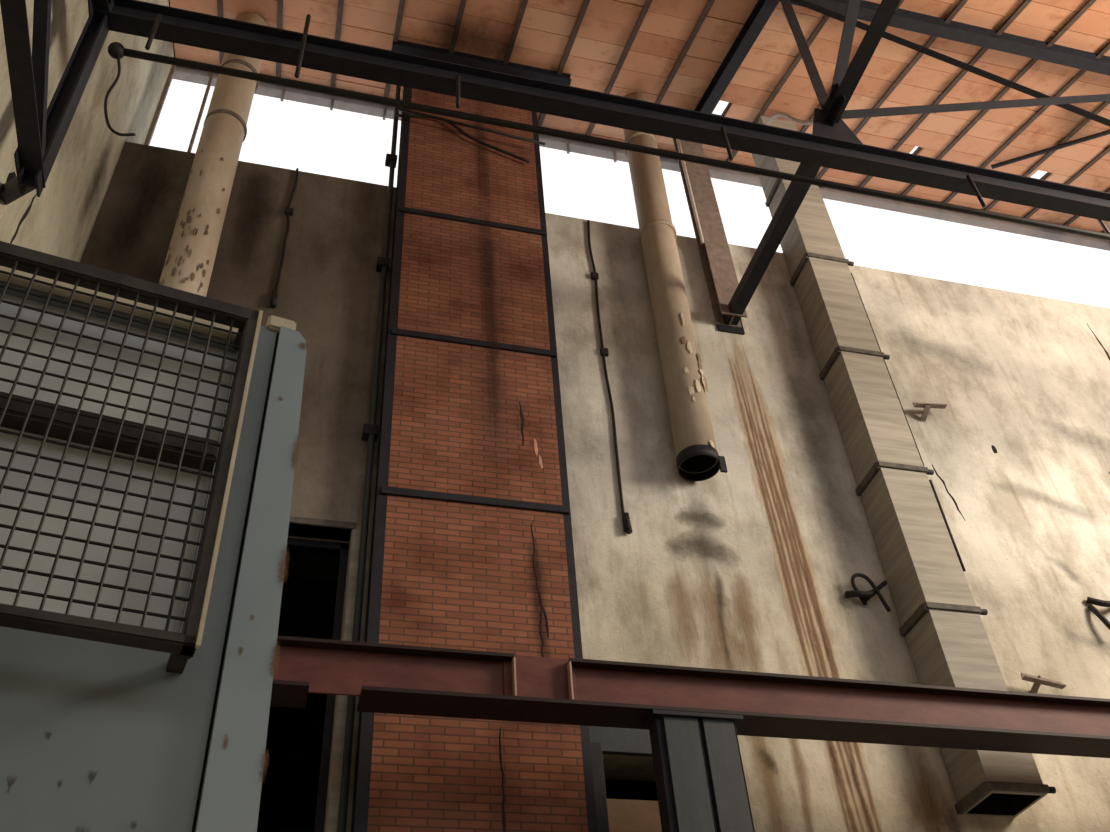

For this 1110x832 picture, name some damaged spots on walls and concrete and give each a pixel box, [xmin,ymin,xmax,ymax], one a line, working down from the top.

crack [518,401,526,445]
corrosion [733,351,839,678]
crack [531,520,549,657]
corrosion [826,741,879,832]